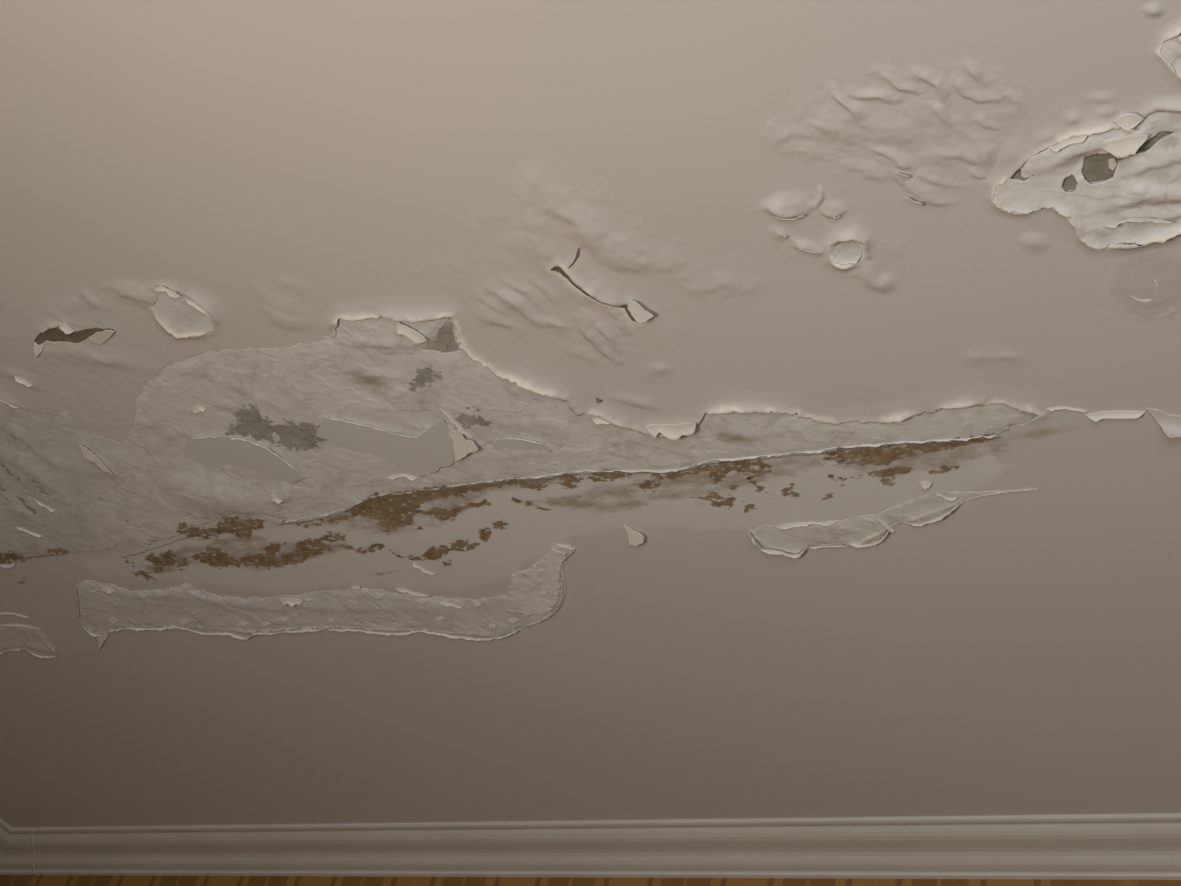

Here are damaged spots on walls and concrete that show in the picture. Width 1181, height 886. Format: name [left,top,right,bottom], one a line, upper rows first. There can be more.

peeling [974,15,1181,259]
peeling [151,286,215,338]
peeling [0,317,1181,568]
rust [821,433,998,500]
rust [121,459,800,582]
peeling [0,612,58,659]
peeling [75,543,575,649]